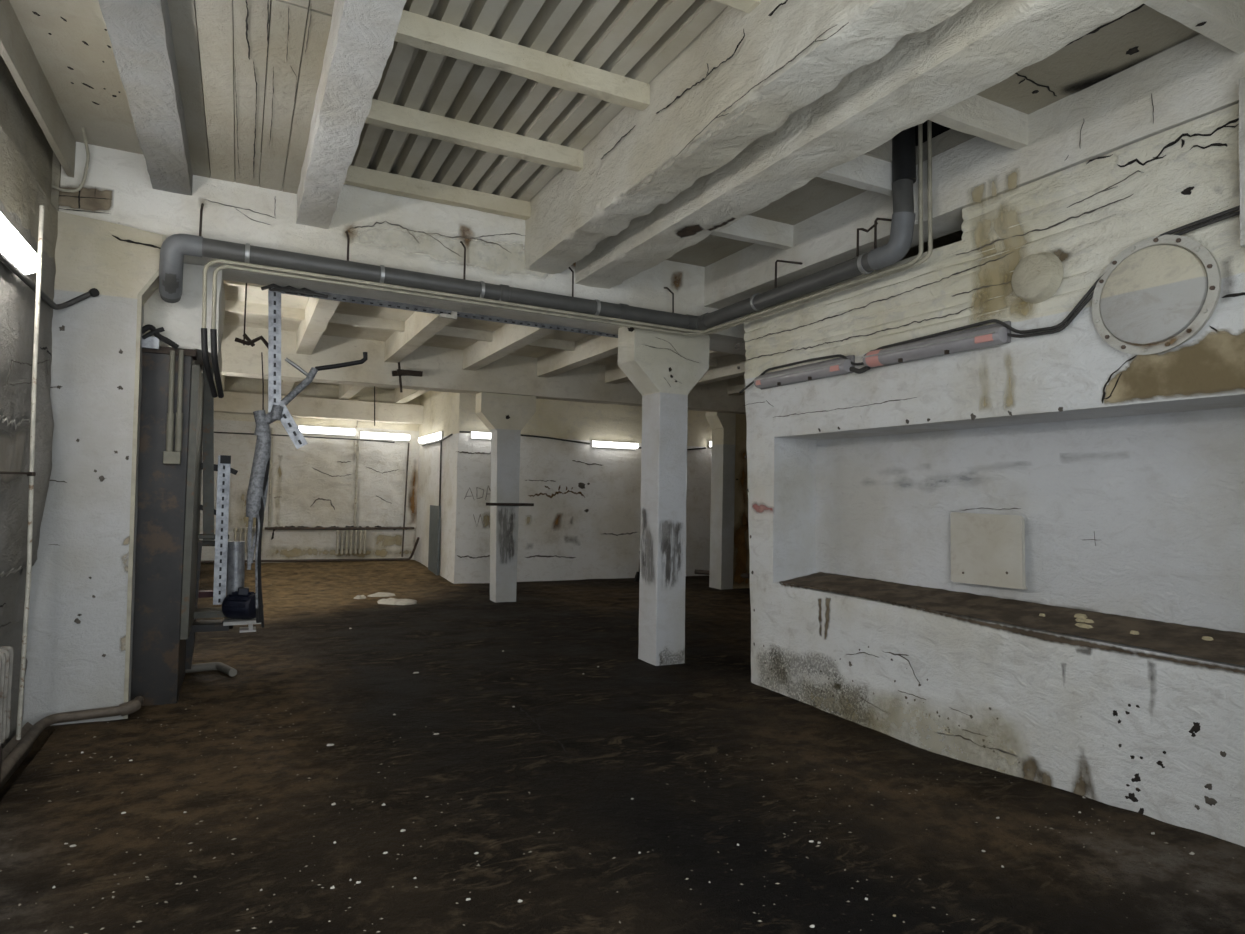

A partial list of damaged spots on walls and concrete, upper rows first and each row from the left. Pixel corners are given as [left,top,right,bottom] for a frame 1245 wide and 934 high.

crack [1061,4,1145,49]
crack [234,0,311,175]
crack [1015,73,1056,96]
crack [204,198,276,225]
crack [347,221,524,257]
crack [740,94,1239,362]
water stain [974,211,1031,318]
flaking render [1102,330,1245,404]
flaking render [0,415,31,484]
peeling [1125,778,1144,814]
spalling [1194,784,1217,810]